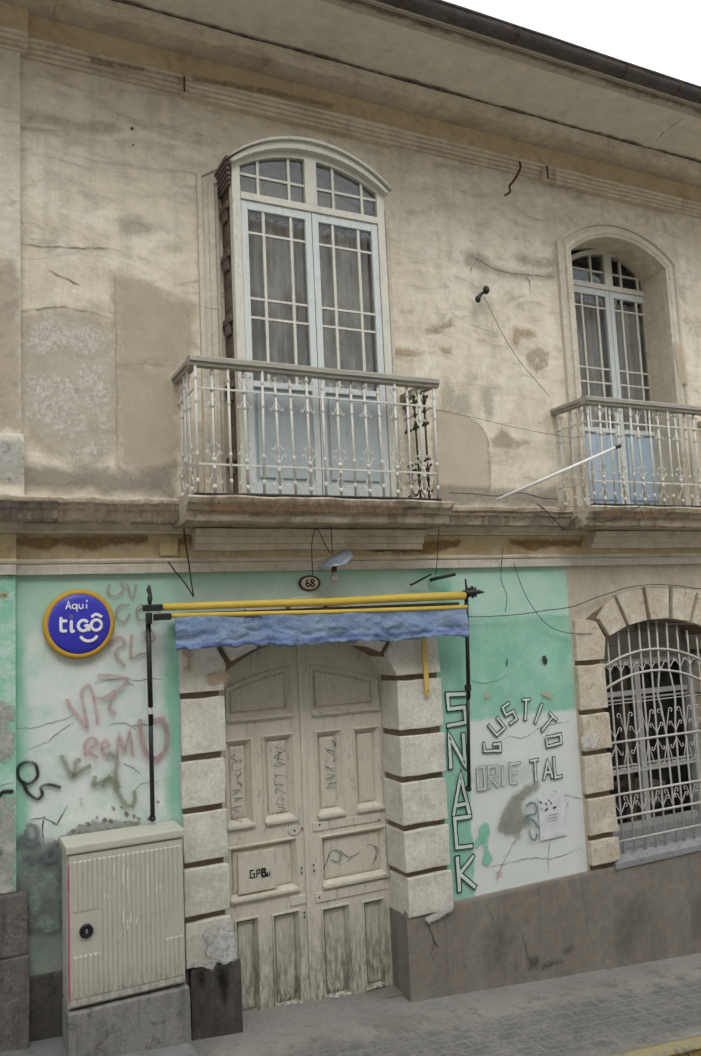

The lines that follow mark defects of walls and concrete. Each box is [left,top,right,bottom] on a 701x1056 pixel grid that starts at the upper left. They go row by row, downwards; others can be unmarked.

peeling [21,315,111,465]
peeling [194,921,238,970]